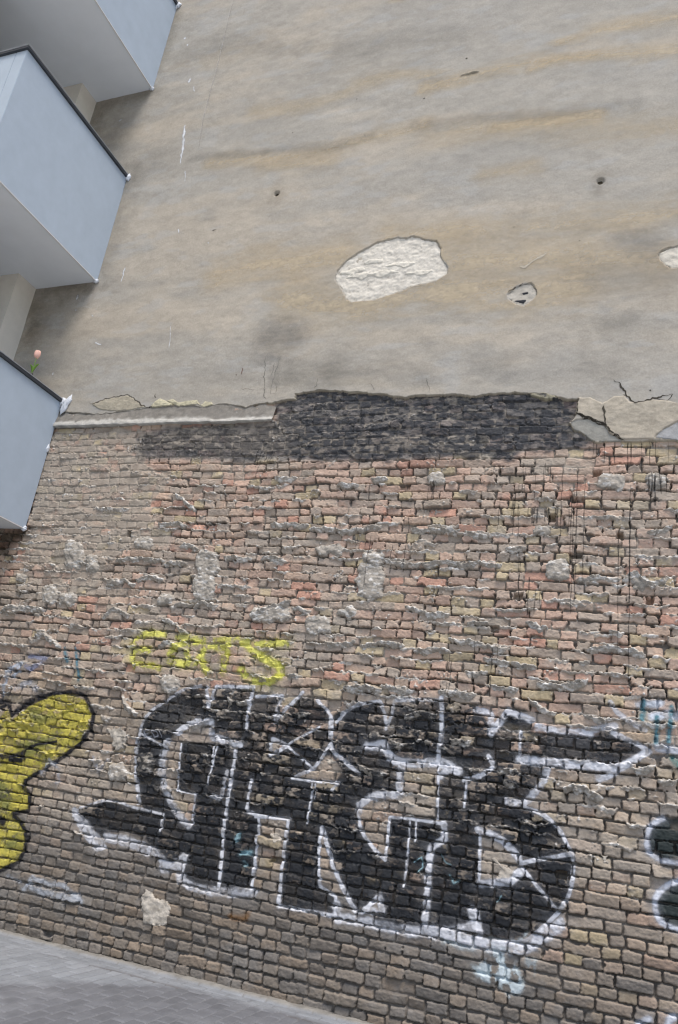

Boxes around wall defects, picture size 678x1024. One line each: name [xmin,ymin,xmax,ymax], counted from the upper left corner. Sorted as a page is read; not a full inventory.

spalling [659,247,678,268]
spalling [336,237,448,302]
spalling [508,285,536,305]
peeling [92,395,213,411]
crack [576,380,673,440]